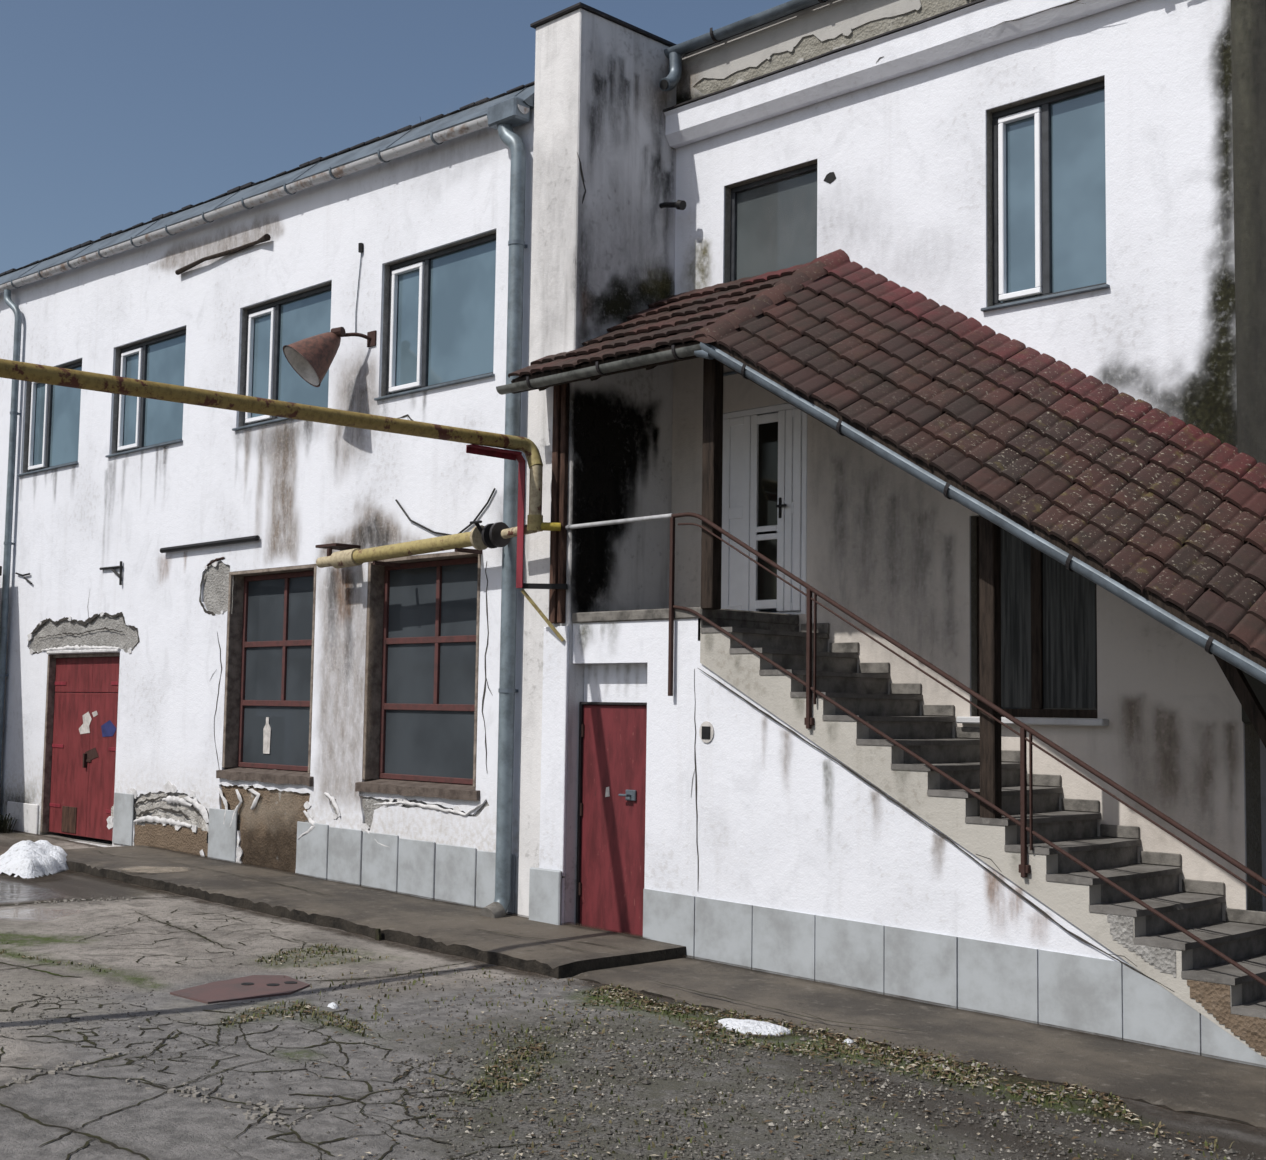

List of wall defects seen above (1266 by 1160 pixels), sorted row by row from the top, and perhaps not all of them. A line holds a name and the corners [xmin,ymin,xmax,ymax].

peeling [694,0,976,94]
leakage [1163,376,1235,447]
leakage [260,429,294,553]
leakage [568,393,659,613]
spalling [199,557,233,616]
spalling [27,611,139,655]
spalling [126,781,341,873]
spalling [360,796,489,847]
crack [104,905,338,968]
crack [12,994,551,1160]